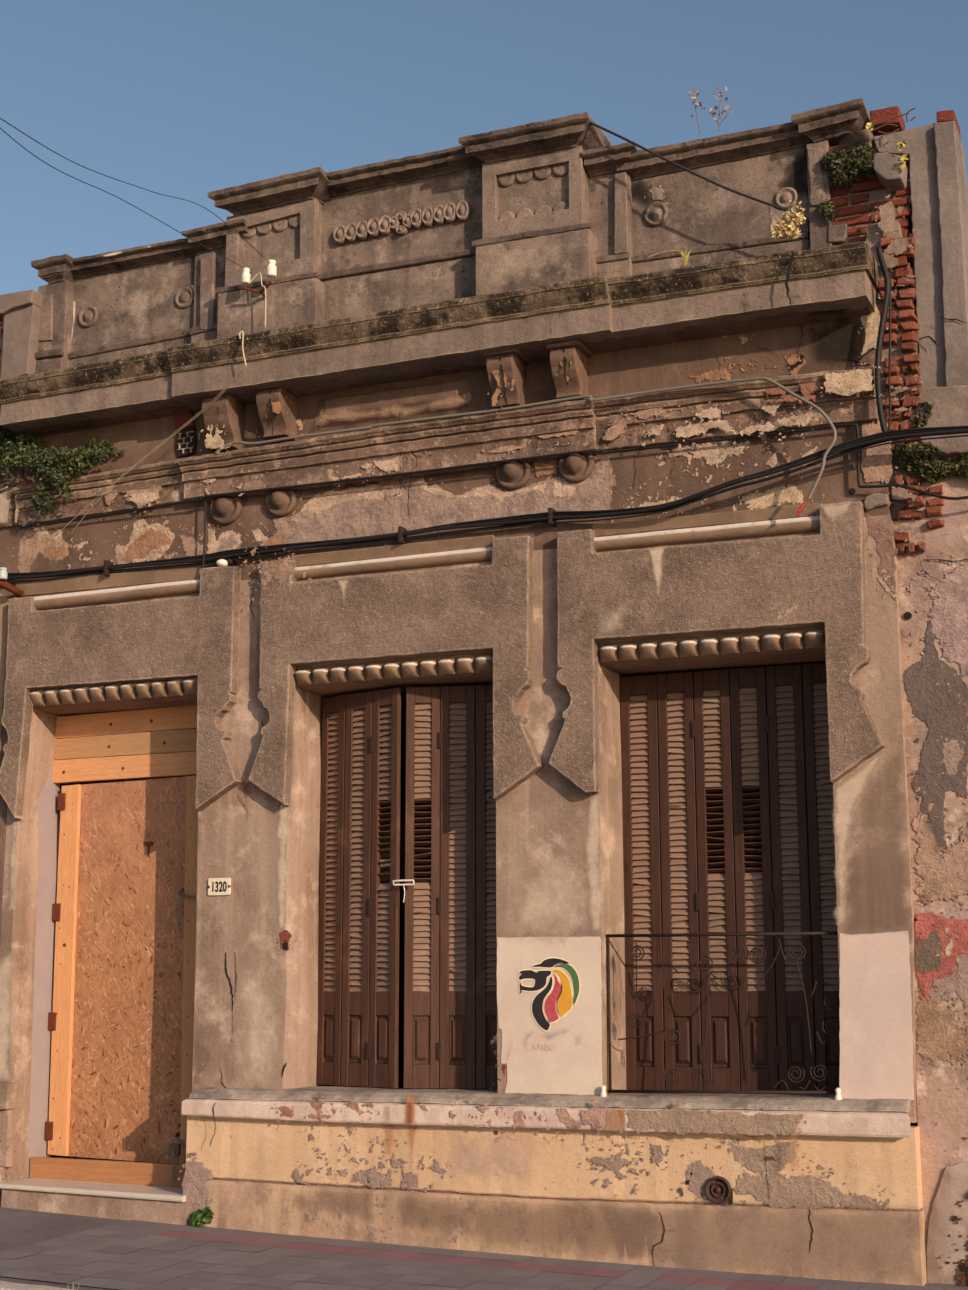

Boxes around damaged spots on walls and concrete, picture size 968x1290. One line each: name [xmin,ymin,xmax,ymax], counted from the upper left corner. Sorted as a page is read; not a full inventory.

spalling [873,152,907,191]
crack [750,251,804,360]
crack [499,355,508,405]
peeling [10,294,888,605]
peeling [849,419,968,1093]
spalling [277,930,297,950]
crack [210,952,237,1146]
rust [406,1096,414,1136]
peeling [271,1093,455,1243]
crack [652,1212,674,1265]
crack [806,1209,814,1253]
spalling [939,1200,968,1286]